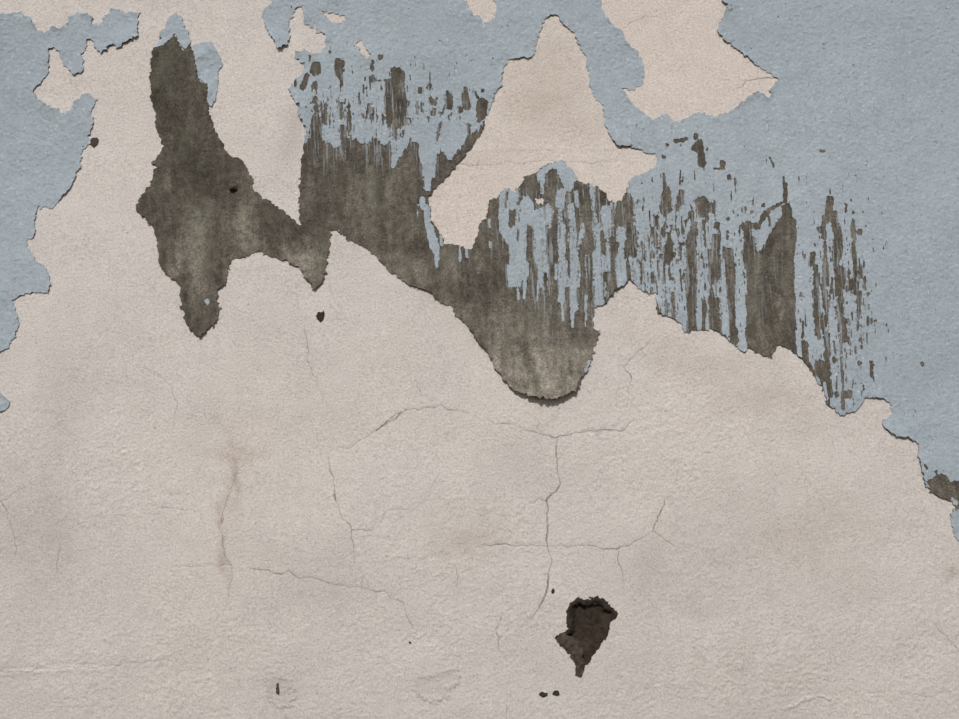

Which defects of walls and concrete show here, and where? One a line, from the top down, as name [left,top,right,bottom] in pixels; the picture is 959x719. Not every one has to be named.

peeling [0,8,141,351]
peeling [136,0,959,541]
spalling [555,595,618,677]